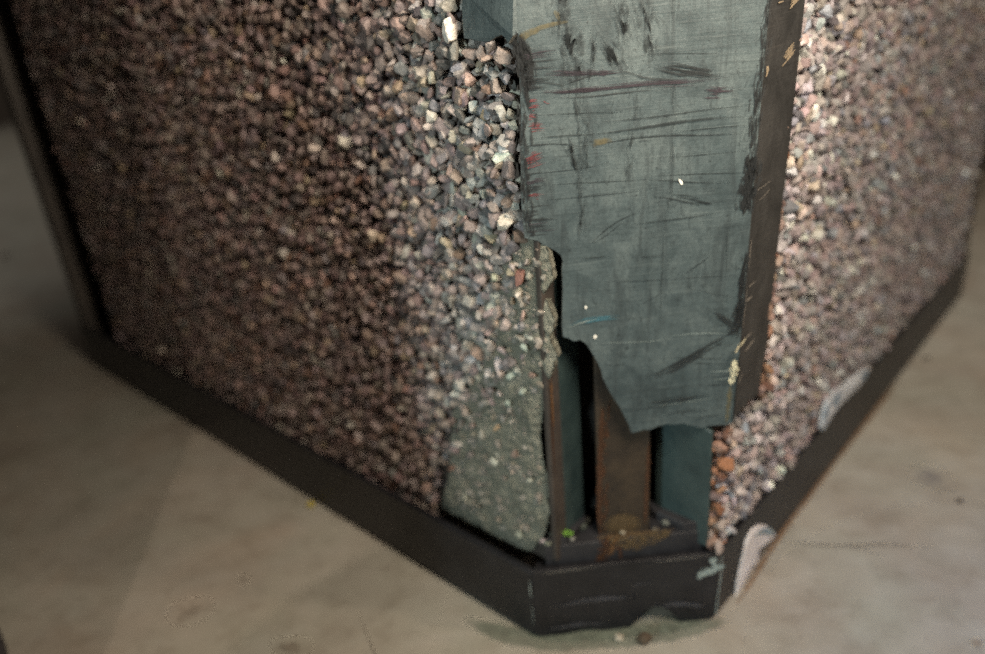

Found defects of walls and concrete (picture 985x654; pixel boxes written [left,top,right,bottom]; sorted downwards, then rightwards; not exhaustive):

corrosion [596,399,671,561]